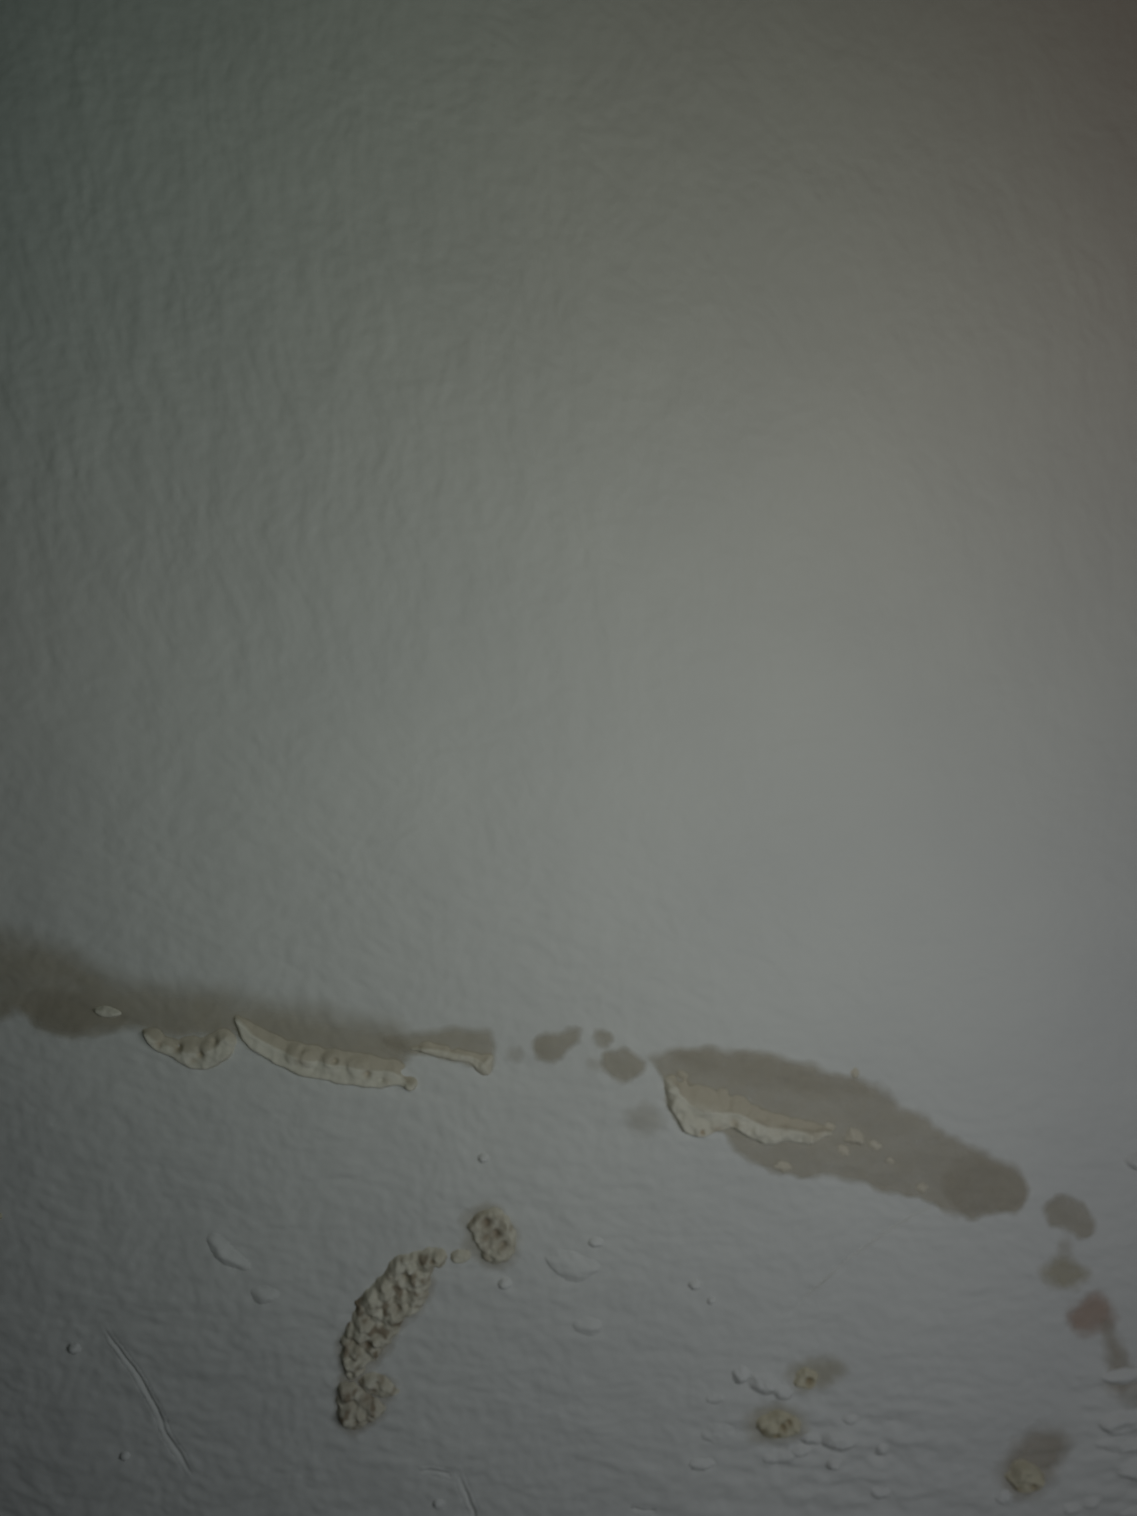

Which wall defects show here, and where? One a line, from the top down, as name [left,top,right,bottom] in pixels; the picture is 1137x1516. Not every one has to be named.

leakage [0,951,491,1060]
leakage [660,1052,1025,1217]